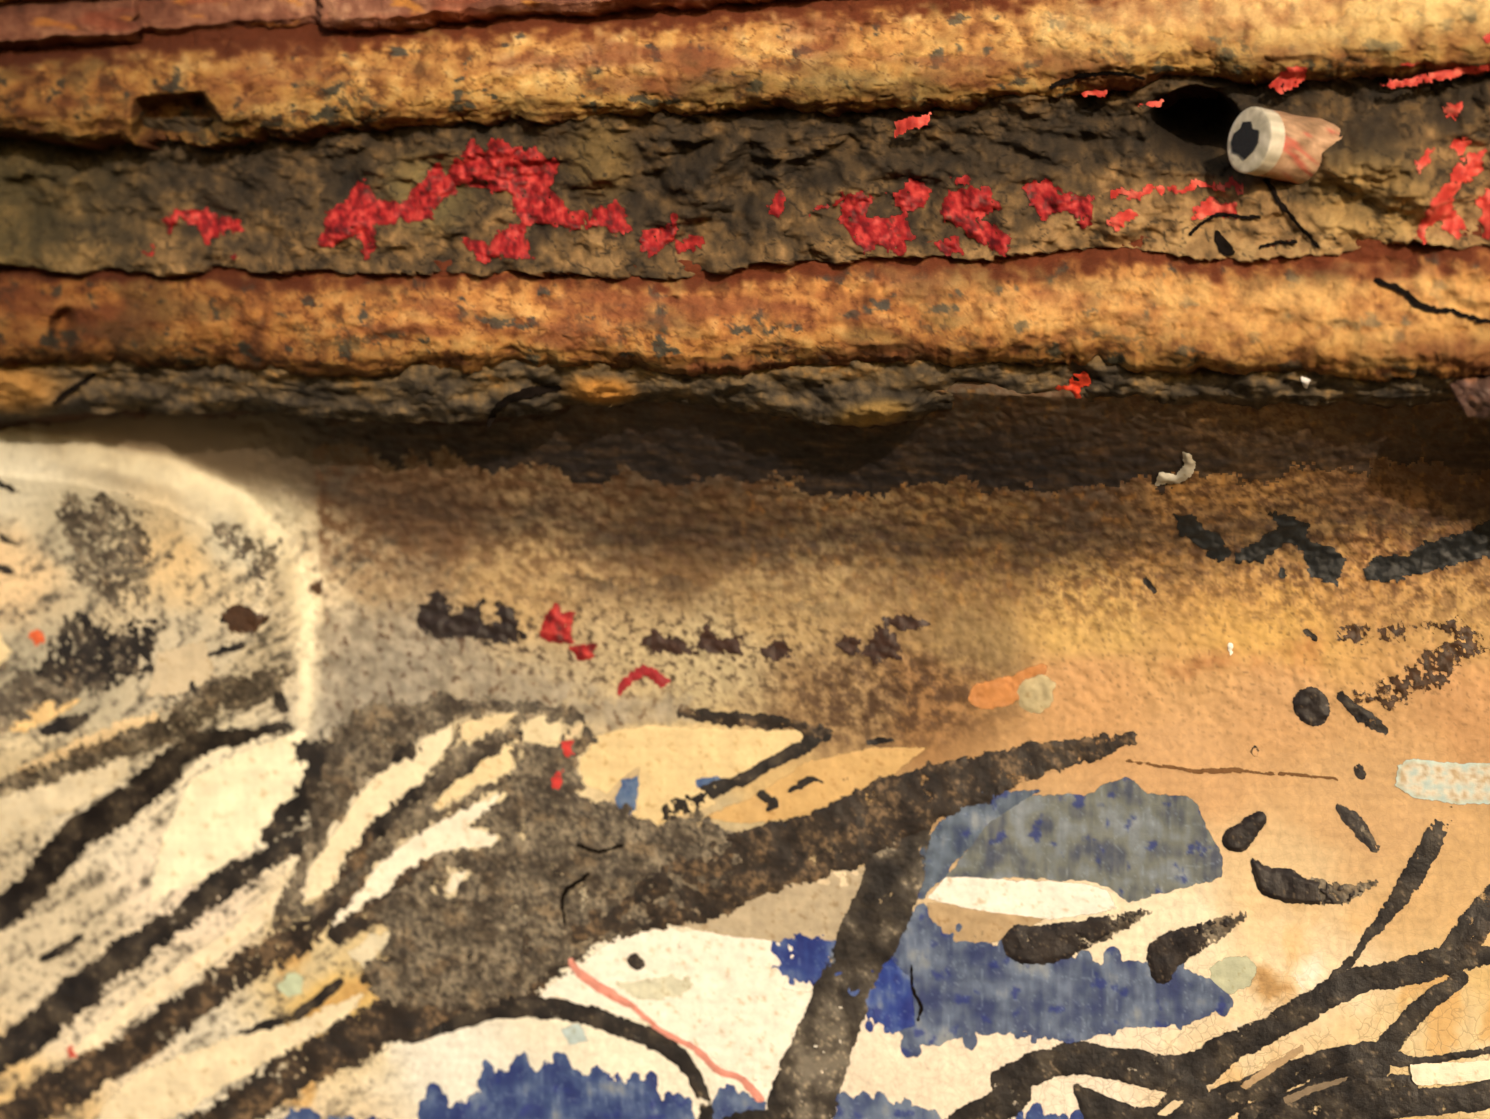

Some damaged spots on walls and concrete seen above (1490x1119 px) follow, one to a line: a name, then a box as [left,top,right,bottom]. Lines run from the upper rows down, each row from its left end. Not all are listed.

corrosion [0,0,1490,151]
peeling [1268,65,1307,94]
peeling [1382,62,1490,89]
peeling [894,112,932,138]
peeling [162,207,245,245]
peeling [317,138,705,264]
peeling [809,175,1012,257]
peeling [1022,176,1244,232]
peeling [1415,101,1490,245]
corrosion [0,225,1490,382]
crack [1373,277,1490,323]
leakage [263,381,1490,637]